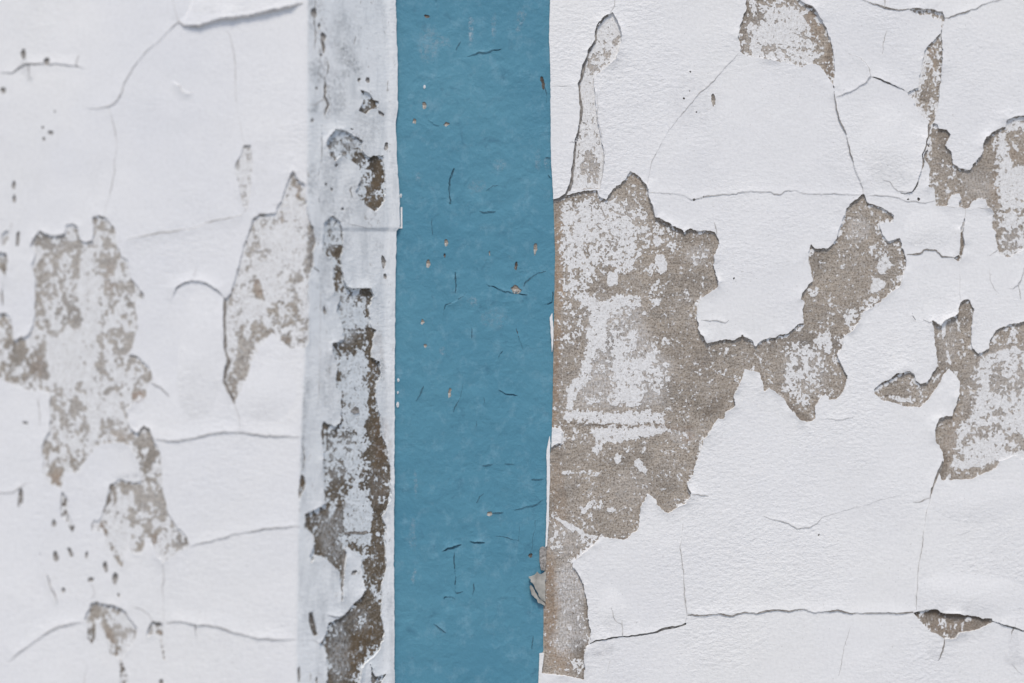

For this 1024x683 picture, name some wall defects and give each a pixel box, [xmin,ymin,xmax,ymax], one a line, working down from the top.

crack [90,1,329,215]
crack [545,2,615,202]
crack [647,0,996,219]
peeling [908,8,1024,261]
peeling [0,215,189,683]
crack [155,270,305,471]
peeling [225,145,391,683]
peeling [529,0,906,683]
crack [907,249,955,258]
peeling [874,299,1024,480]
crack [590,461,943,673]
peeling [914,609,991,639]